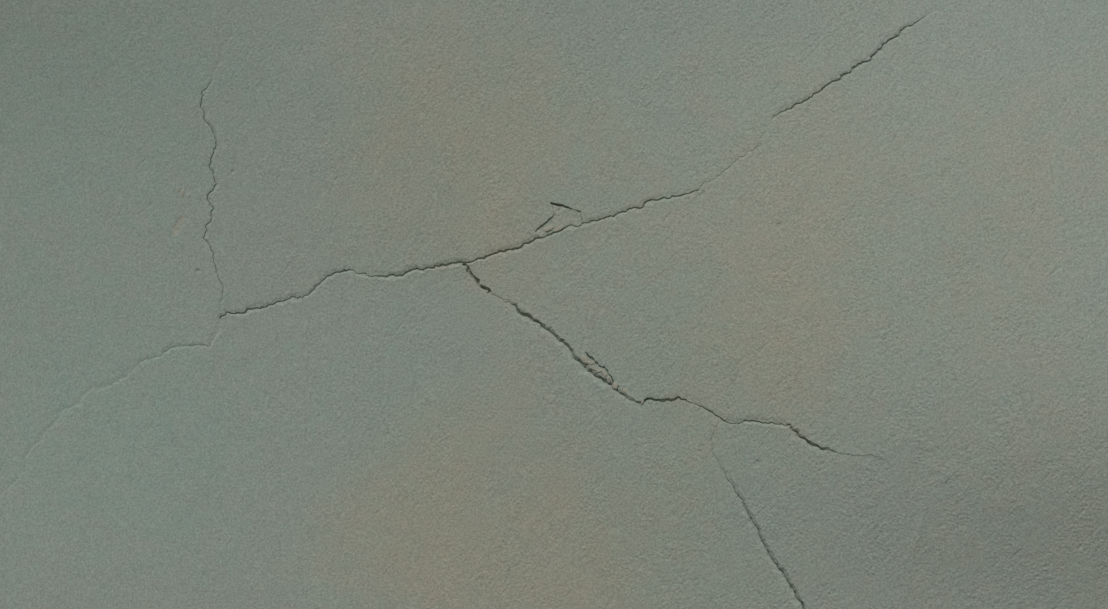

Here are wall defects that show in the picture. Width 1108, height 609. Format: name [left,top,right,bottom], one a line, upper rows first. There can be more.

crack [0,0,971,506]
crack [710,420,811,609]